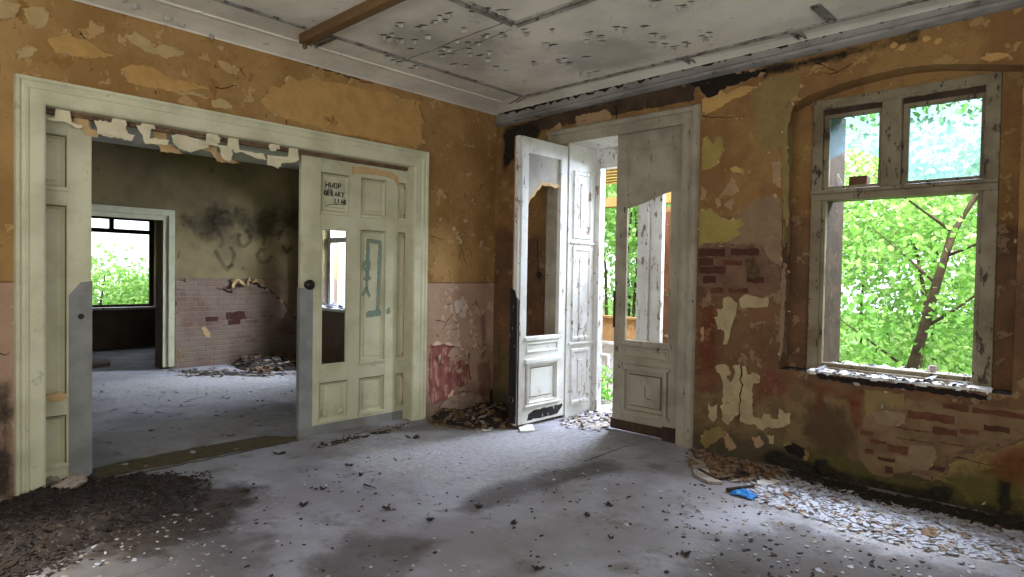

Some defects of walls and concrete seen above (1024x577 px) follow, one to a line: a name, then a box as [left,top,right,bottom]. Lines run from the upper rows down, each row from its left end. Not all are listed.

peeling [0,0,115,60]
peeling [120,31,233,110]
peeling [379,12,453,72]
peeling [438,7,511,74]
peeling [542,26,627,77]
peeling [47,109,299,169]
peeling [260,75,426,149]
peeling [689,66,1024,495]
flaking render [175,277,298,368]
peeling [428,341,471,404]
crack [736,366,744,420]
leakage [764,403,954,503]